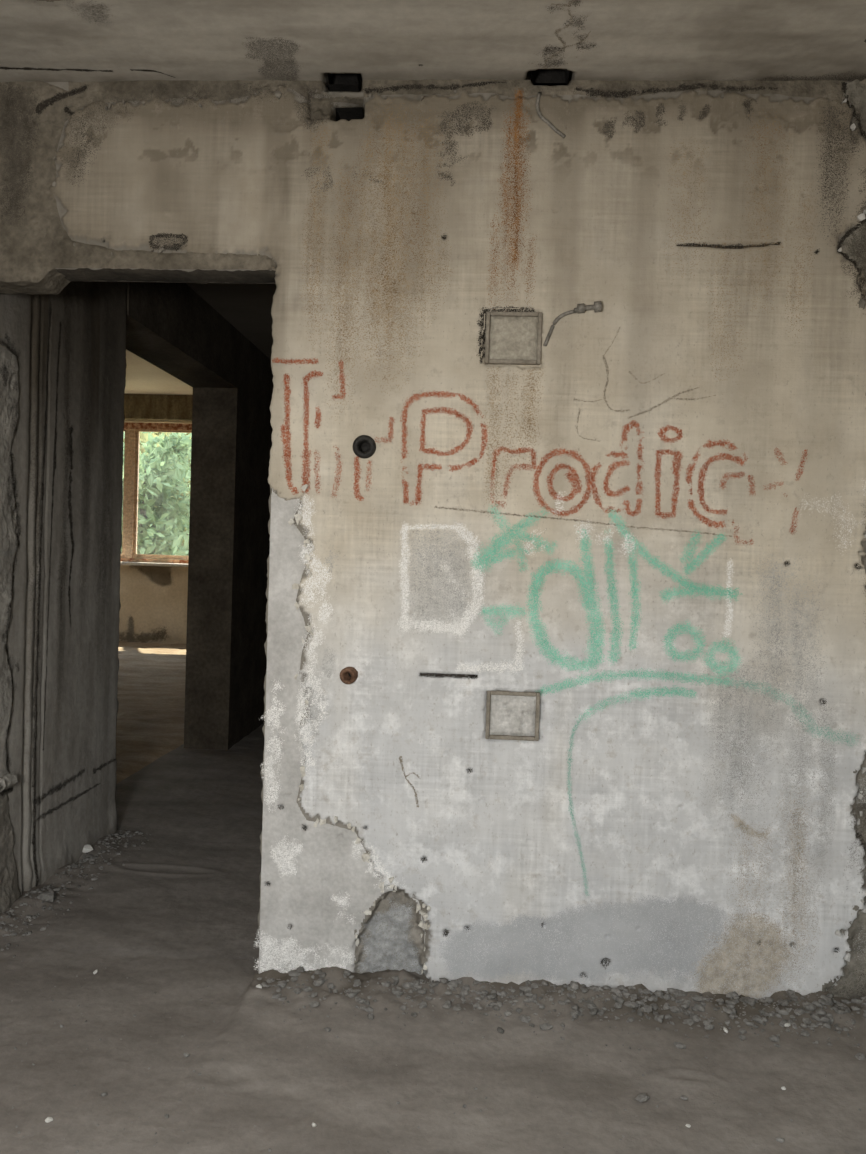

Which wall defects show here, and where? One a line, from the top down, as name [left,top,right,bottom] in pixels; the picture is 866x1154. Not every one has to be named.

peeling [533,0,597,68]
spalling [0,36,342,270]
rust [487,88,537,312]
spalling [360,79,866,186]
spalling [837,203,866,310]
spalling [0,332,21,914]
spalling [129,555,174,587]
spalling [253,484,449,976]
spalling [822,896,866,999]